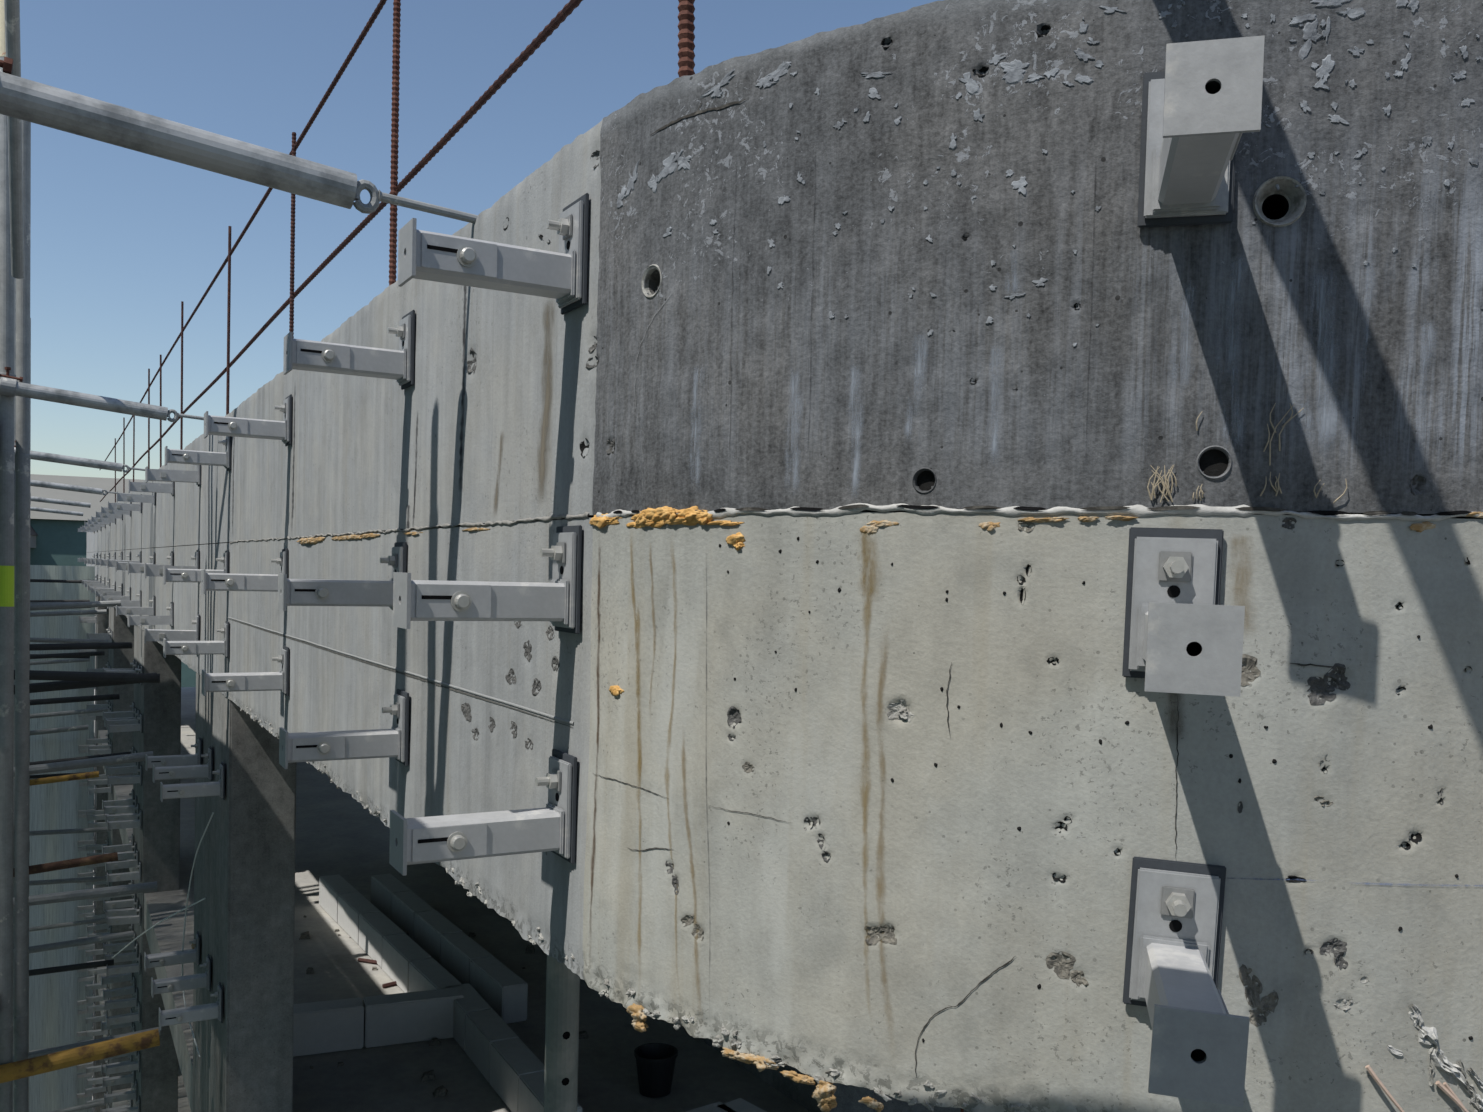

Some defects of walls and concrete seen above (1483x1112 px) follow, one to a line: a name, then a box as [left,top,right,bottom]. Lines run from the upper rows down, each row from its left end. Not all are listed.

peeling [955,17,1104,122]
peeling [1270,0,1374,125]
peeling [1006,169,1028,196]
leakage [1301,278,1337,435]
crack [1173,697,1181,858]
spalling [446,867,487,905]
spalling [665,861,679,895]
spalling [681,914,704,941]
spalling [864,924,897,946]
crack [915,957,1014,1078]
spalling [1046,951,1089,986]
peeling [1408,1005,1483,1112]